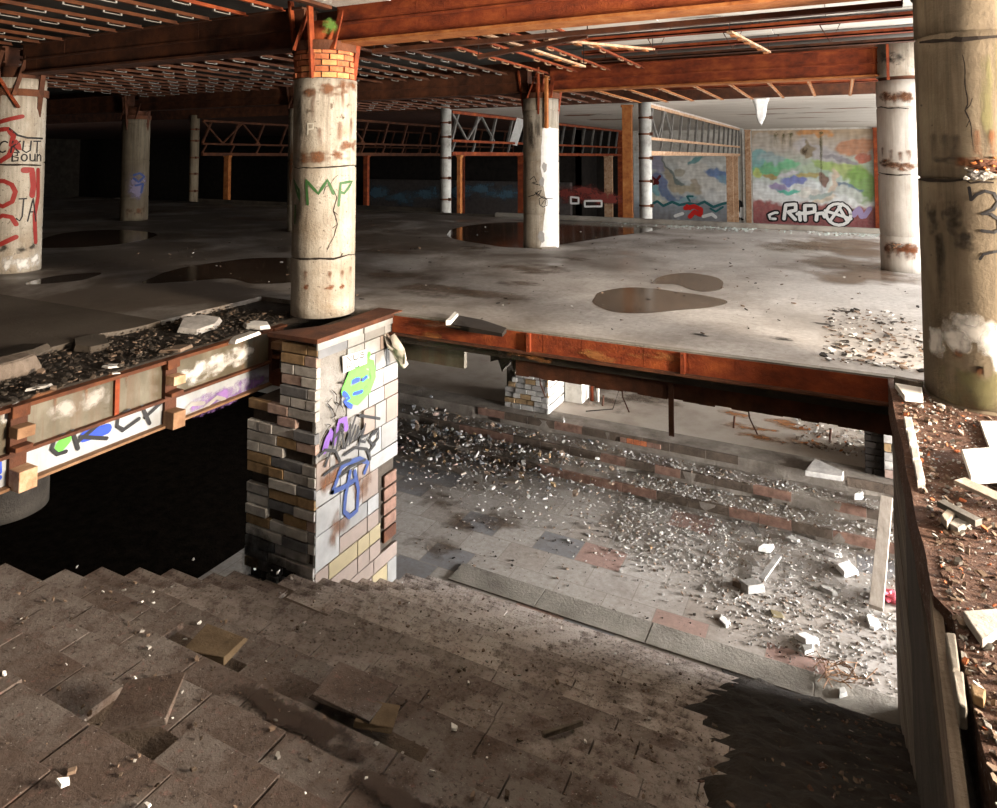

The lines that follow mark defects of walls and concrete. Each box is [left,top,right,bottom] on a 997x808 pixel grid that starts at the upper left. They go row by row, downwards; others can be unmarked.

corrosion [880,92,913,101]
crack [919,35,997,150]
corrosion [880,148,915,171]
crack [879,172,994,184]
corrosion [884,243,918,259]
peeling [929,314,997,371]